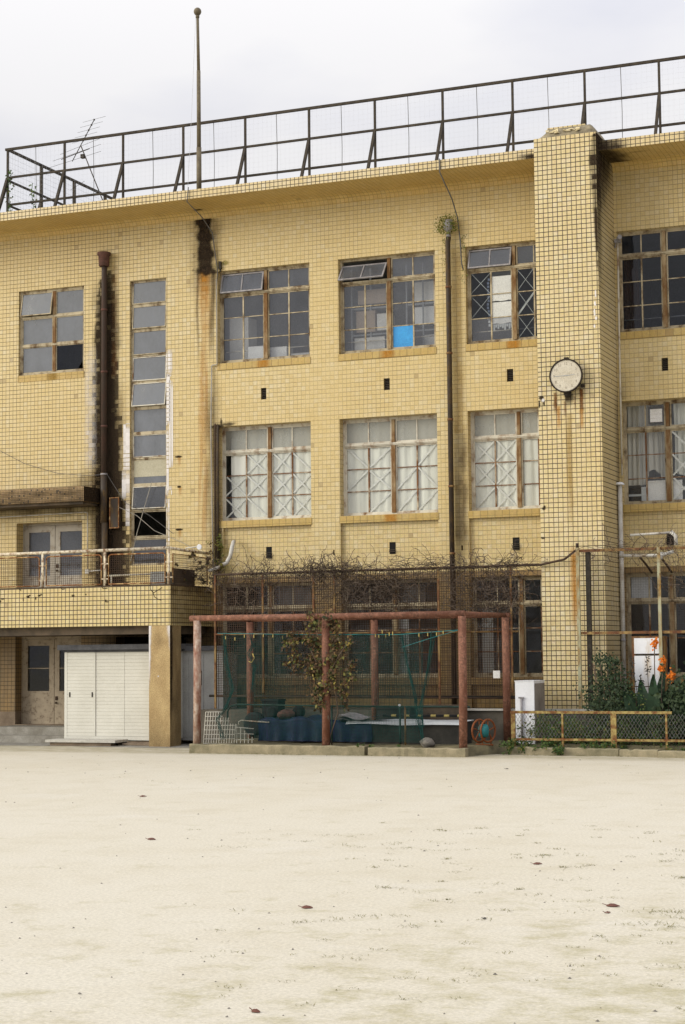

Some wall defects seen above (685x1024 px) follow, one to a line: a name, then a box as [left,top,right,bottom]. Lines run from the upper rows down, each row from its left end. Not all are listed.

damp [195,209,216,321]
damp [589,133,625,265]
damp [20,270,130,586]
rust [554,389,583,417]